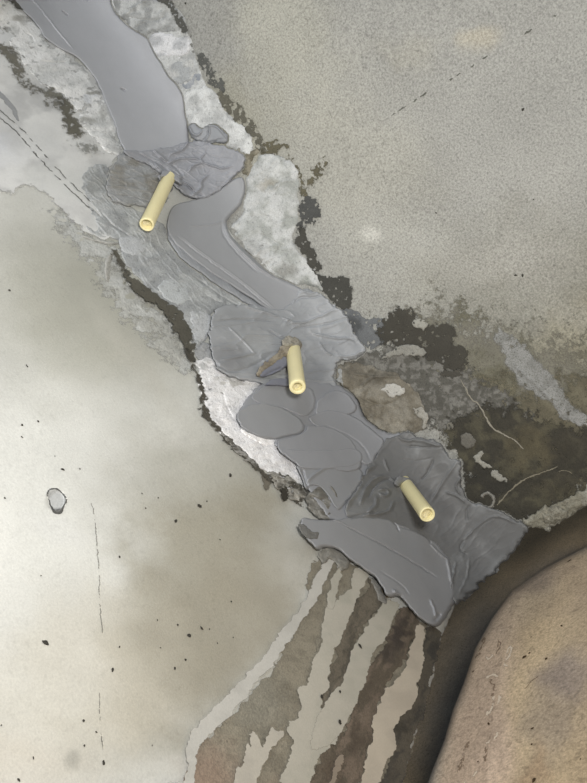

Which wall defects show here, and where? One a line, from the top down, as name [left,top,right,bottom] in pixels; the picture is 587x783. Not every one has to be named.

leakage [0,0,123,240]
peeling [112,0,323,292]
peeling [158,279,223,305]
peeling [190,311,213,360]
peeling [382,344,427,359]
peeling [381,383,405,398]
peeling [413,407,429,430]
leakage [336,281,587,520]
leakage [169,559,442,783]